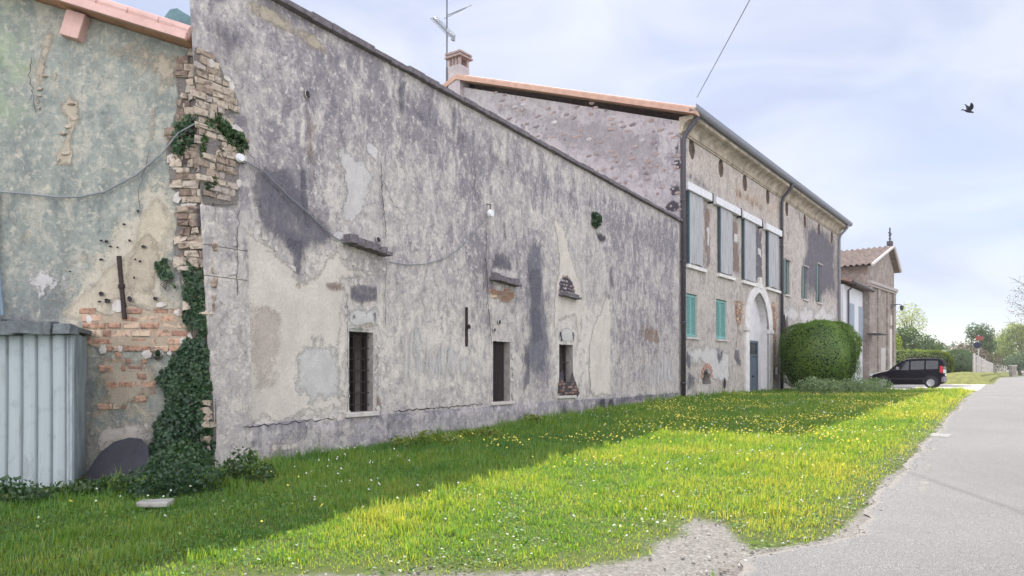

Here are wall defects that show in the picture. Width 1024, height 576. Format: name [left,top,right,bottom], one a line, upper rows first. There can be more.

crack [28,58,36,112]
spalling [56,97,79,166]
peeling [28,268,69,299]
peeling [62,46,386,424]
damp [254,168,331,274]
spalling [489,288,515,303]
damp [525,246,548,385]
peeling [553,219,611,396]